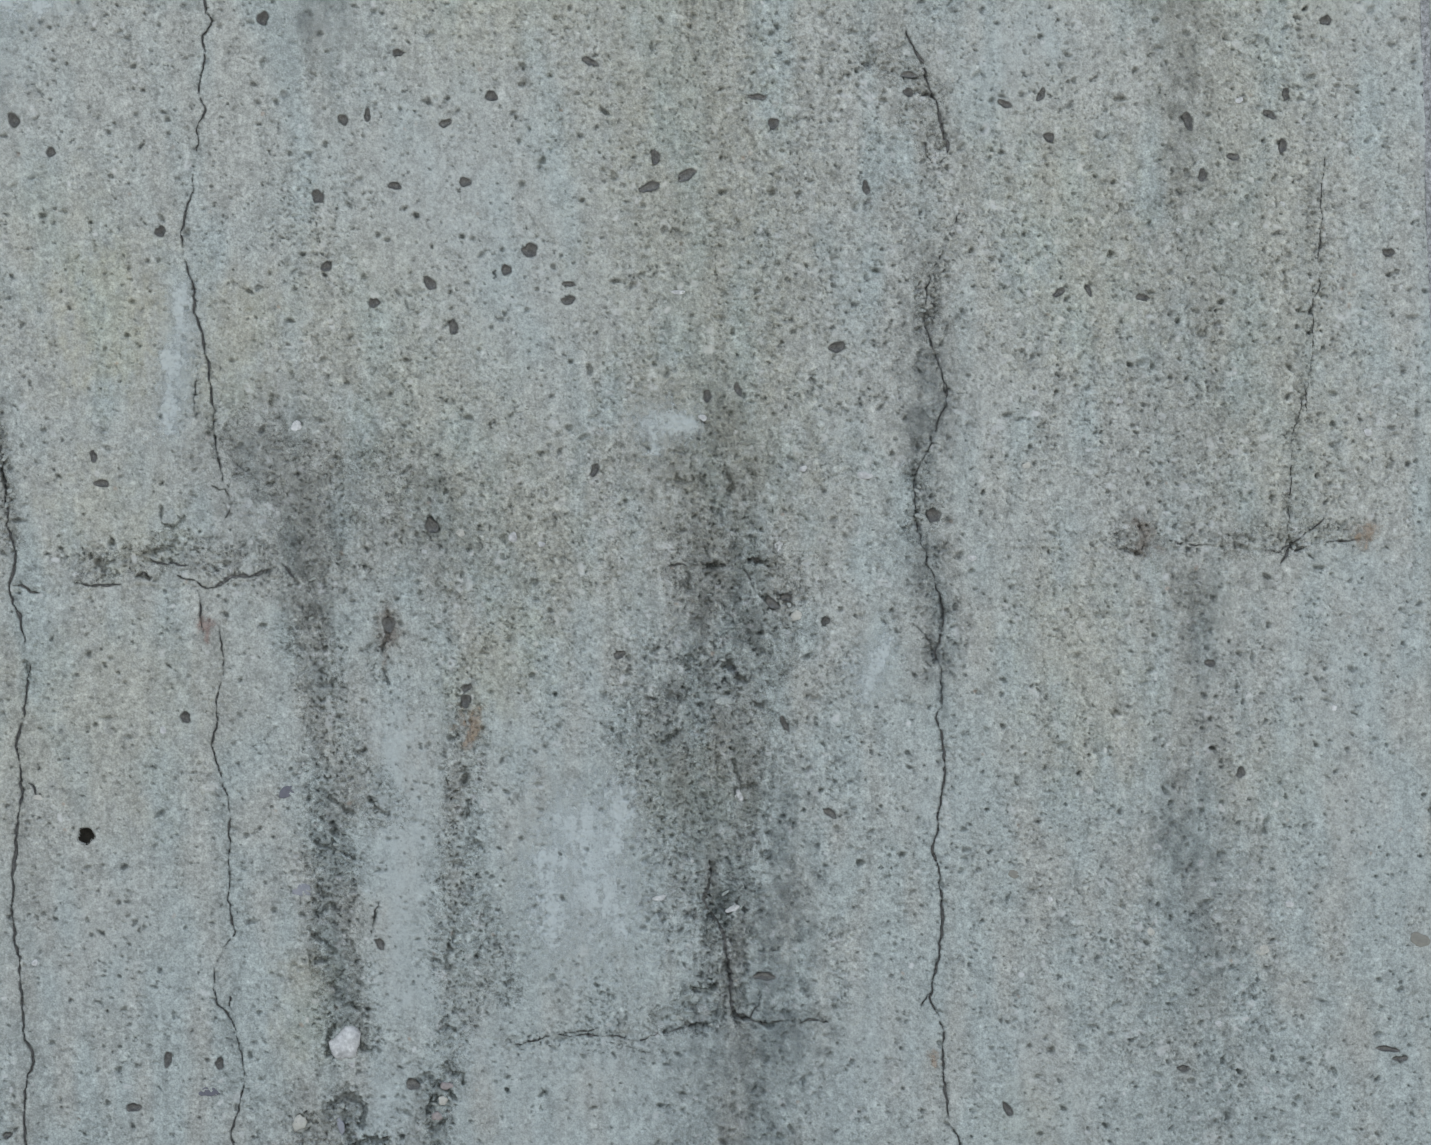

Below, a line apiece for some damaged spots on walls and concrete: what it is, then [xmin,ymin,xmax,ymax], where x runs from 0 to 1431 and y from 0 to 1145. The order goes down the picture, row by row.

crack [0,446,38,1145]
crack [83,559,294,1143]
crack [180,0,230,514]
leakage [627,392,713,456]
crack [519,860,828,1053]
crack [906,31,950,164]
crack [913,214,960,1144]